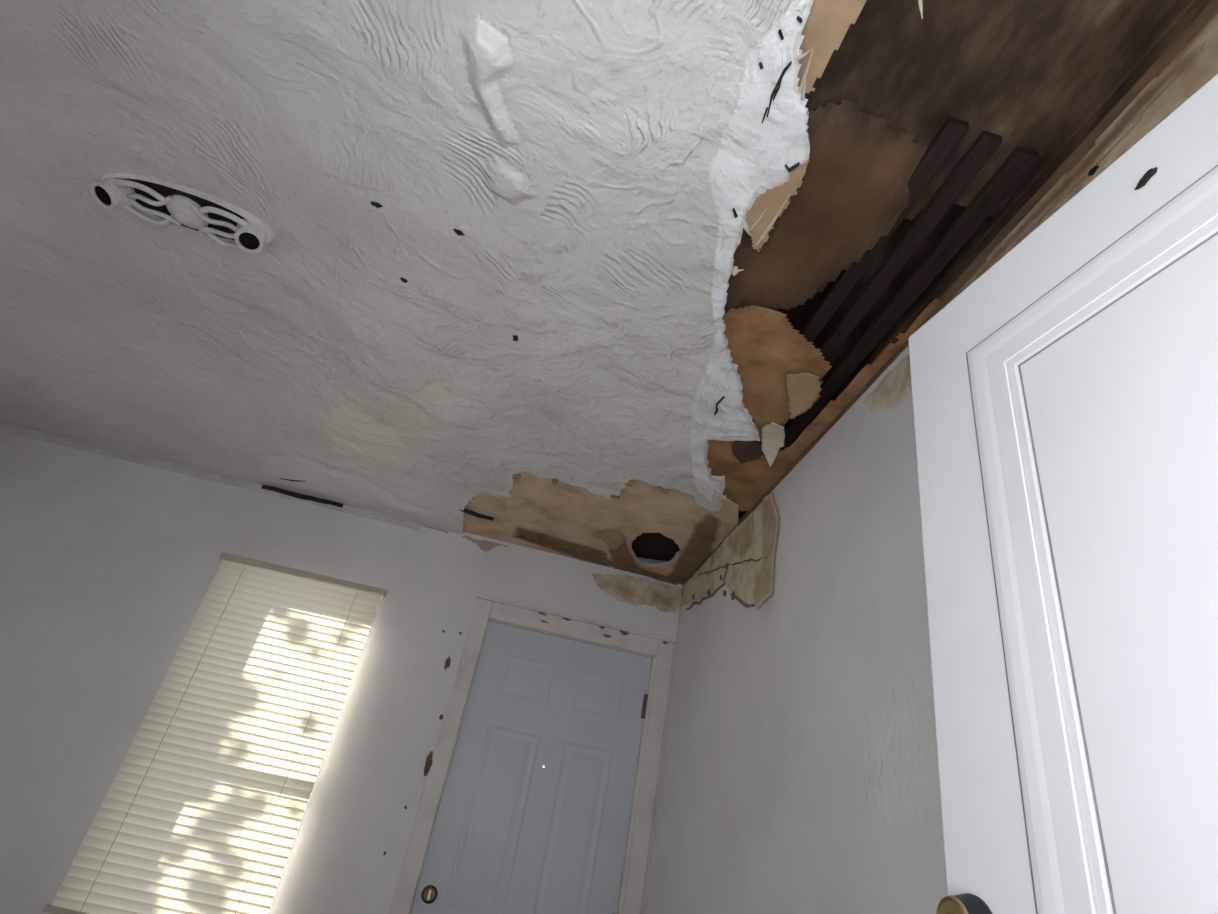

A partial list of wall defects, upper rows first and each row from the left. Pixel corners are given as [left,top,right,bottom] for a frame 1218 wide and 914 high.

damp [961,37,1207,292]
flaking render [990,14,1218,268]
peeling [238,0,811,614]
flaking render [863,344,912,412]